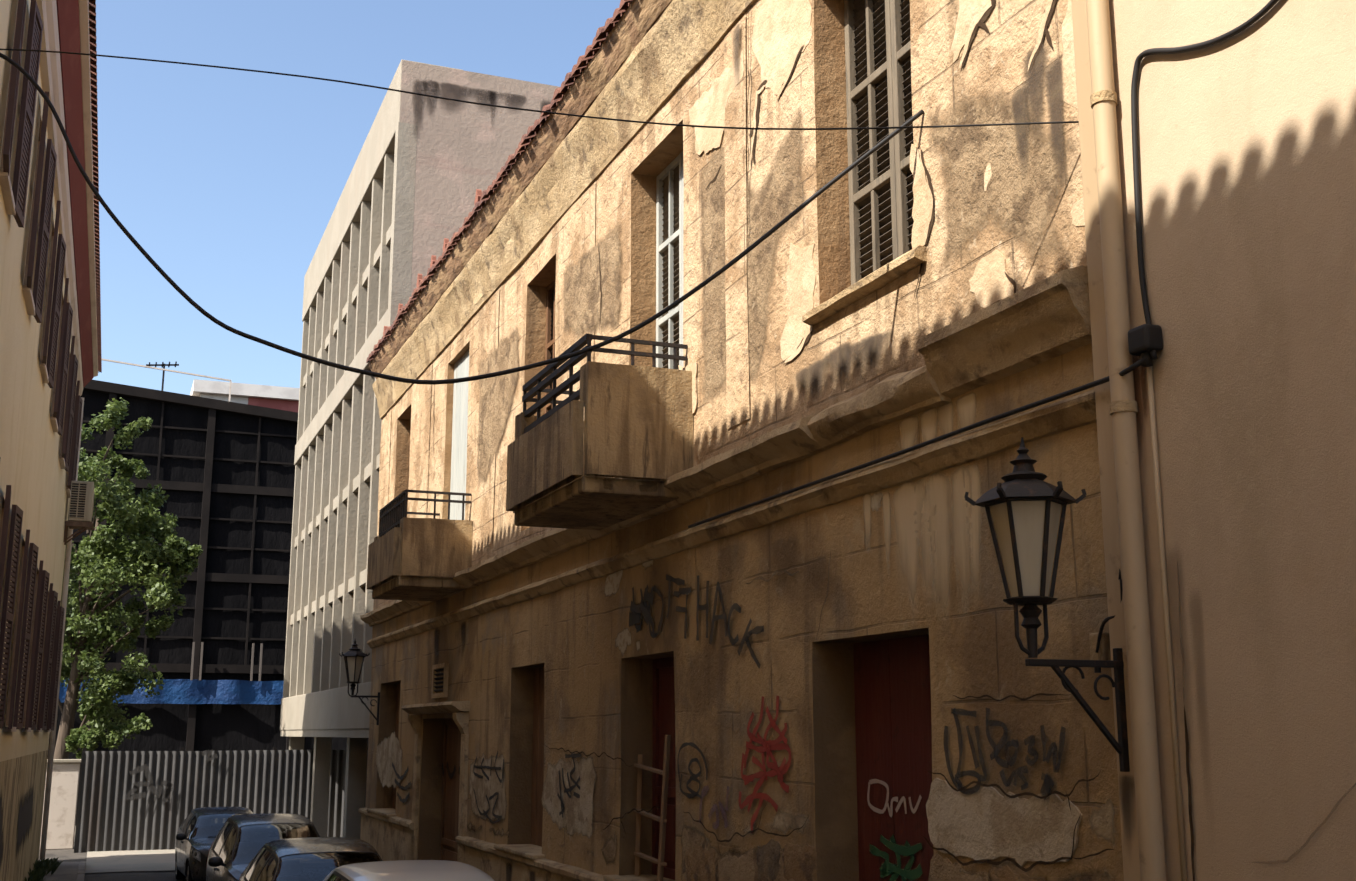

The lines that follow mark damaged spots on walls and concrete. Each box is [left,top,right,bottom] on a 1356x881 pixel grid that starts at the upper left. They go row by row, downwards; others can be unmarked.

crack [959,0,995,69]
crack [1028,0,1056,71]
damp [414,80,525,120]
damp [796,333,886,394]
crack [1248,783,1356,864]
spalling [928,853,1114,881]